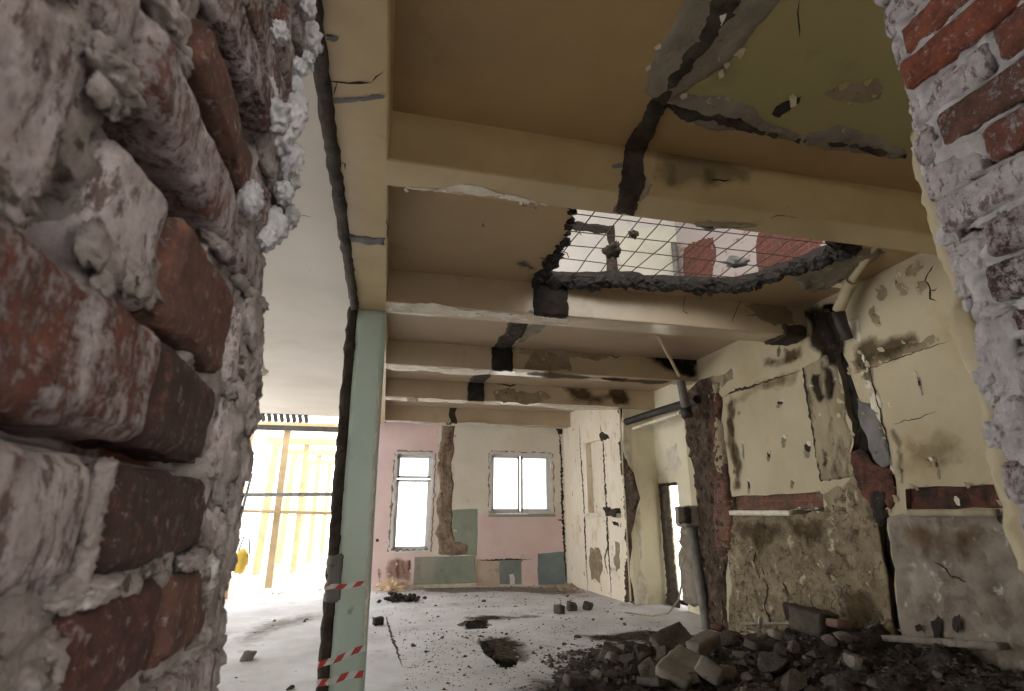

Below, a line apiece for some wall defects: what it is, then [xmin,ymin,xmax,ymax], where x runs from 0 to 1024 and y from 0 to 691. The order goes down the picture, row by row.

crack [331,71,384,93]
peeling [404,184,548,209]
spalling [531,208,886,326]
leakage [855,336,917,381]
flaking render [833,260,1003,535]
spalling [362,383,538,644]
spalling [485,387,648,605]